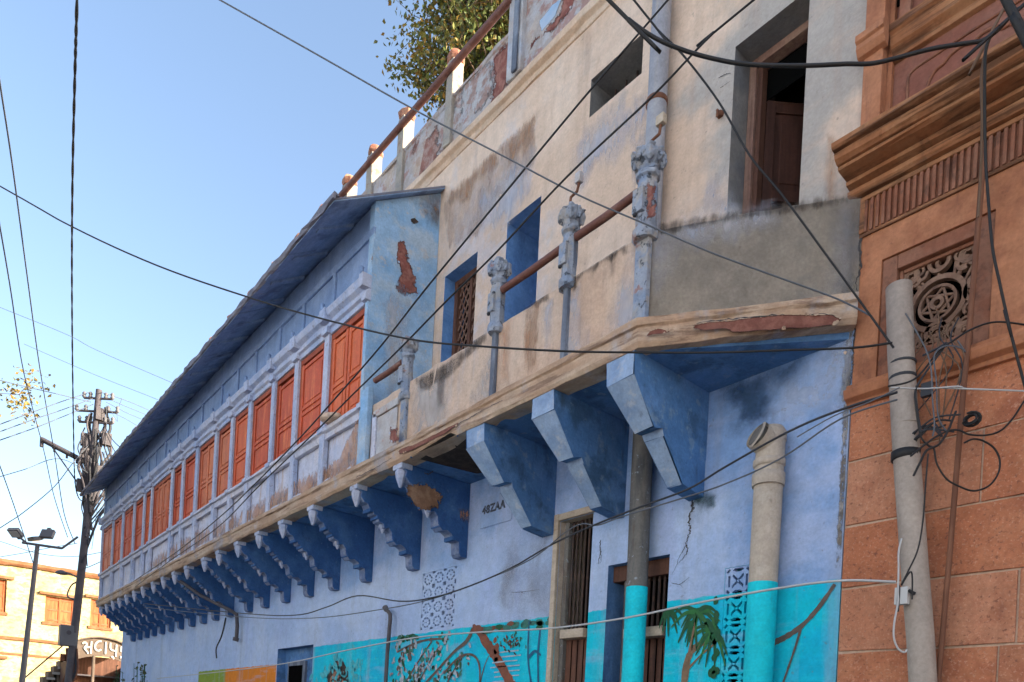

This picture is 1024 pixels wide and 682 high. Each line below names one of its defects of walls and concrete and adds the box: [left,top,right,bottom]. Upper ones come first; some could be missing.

peeling [530,0,574,49]
peeling [460,42,508,114]
peeling [412,125,442,175]
peeling [645,182,657,219]
leakage [660,197,848,236]
peeling [396,240,418,296]
peeling [694,312,841,332]
leakage [727,361,795,418]
spalling [407,483,443,511]
crack [672,500,695,585]